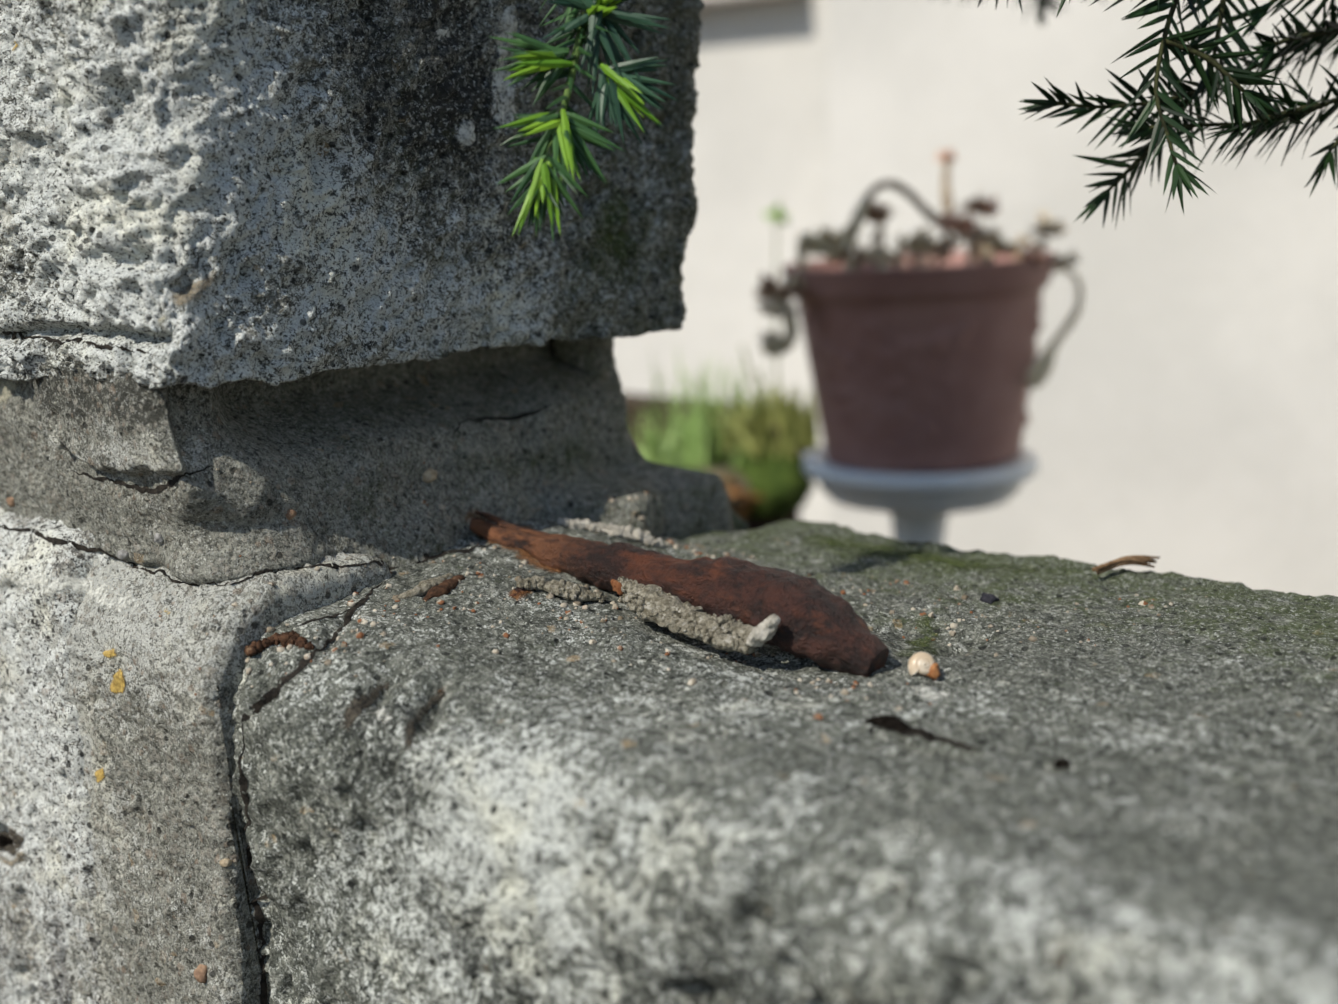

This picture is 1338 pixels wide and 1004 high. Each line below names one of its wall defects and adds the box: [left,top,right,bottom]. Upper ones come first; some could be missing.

crack [0,331,150,354]
crack [71,465,212,494]
crack [0,524,494,1004]